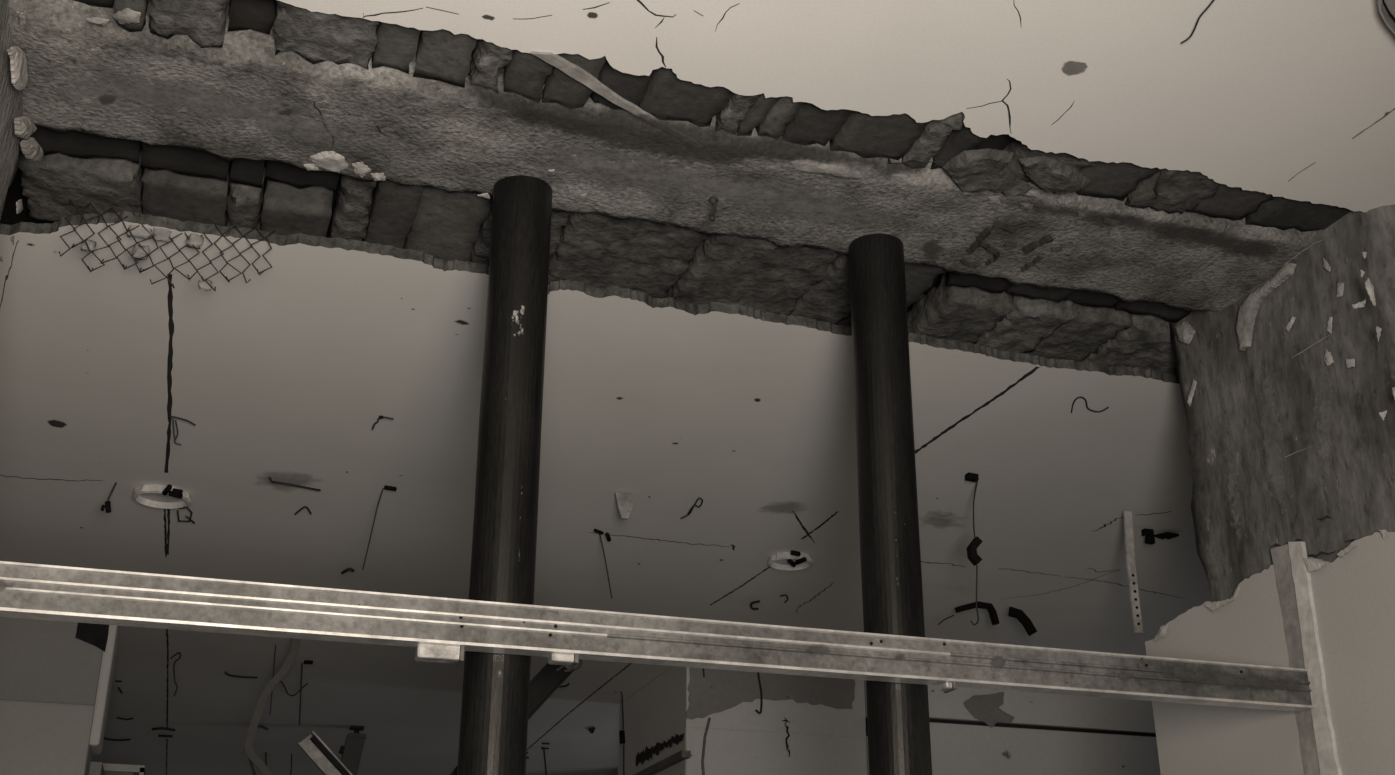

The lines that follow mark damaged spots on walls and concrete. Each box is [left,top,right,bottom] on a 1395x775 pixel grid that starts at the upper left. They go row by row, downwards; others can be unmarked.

peeling [87,8,141,26]
crack [363,7,458,18]
crack [526,0,740,67]
flaking render [7,46,28,90]
crack [966,79,1011,132]
flaking render [14,116,43,161]
spalling [304,151,386,181]
spalling [767,159,865,180]
spalling [943,148,1092,210]
peeling [1323,252,1376,309]
flaking render [1236,263,1296,351]
flaking render [1176,322,1195,344]